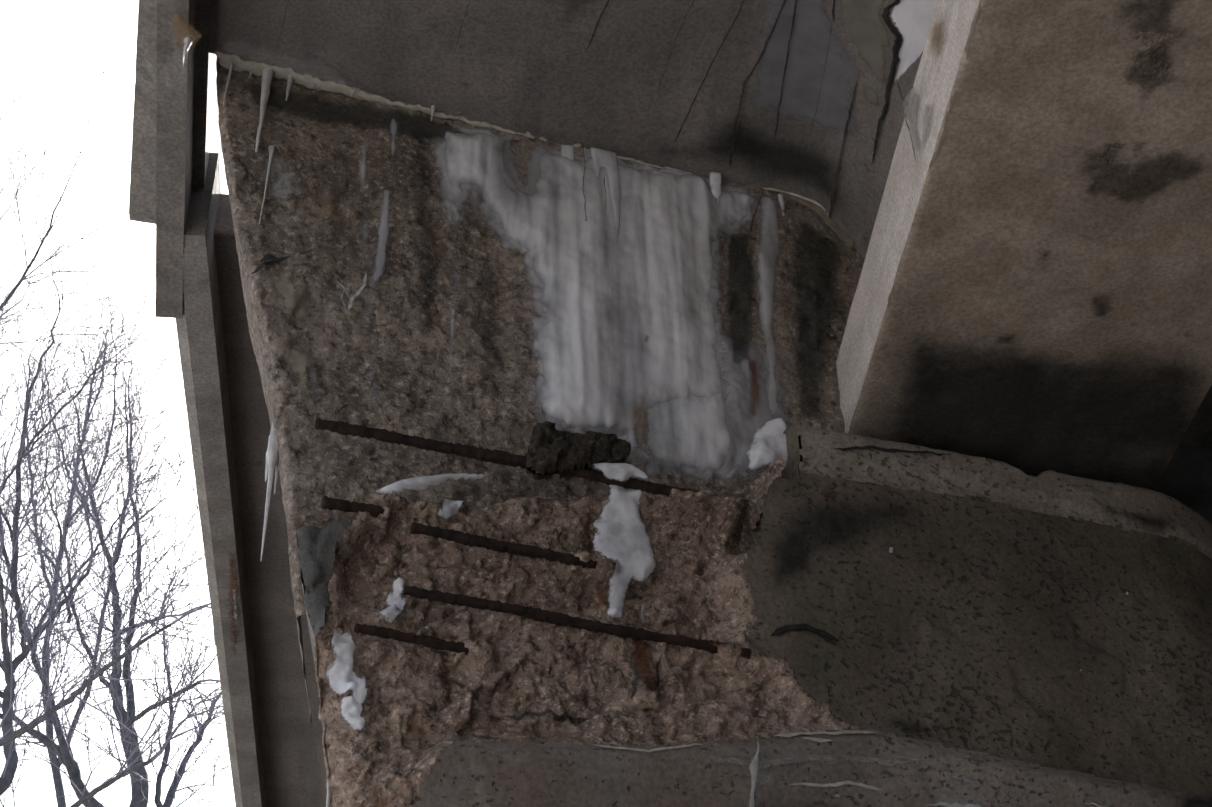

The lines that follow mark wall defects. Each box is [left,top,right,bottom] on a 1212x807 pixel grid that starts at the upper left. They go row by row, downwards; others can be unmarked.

crack [588,0,609,47]
leakage [561,143,721,230]
crack [675,0,744,142]
crack [729,0,797,169]
crack [829,0,916,218]
leakage [1088,145,1199,200]
leakage [1128,0,1170,88]
leakage [710,125,854,415]
peeling [288,347,312,393]
spalling [312,418,860,807]